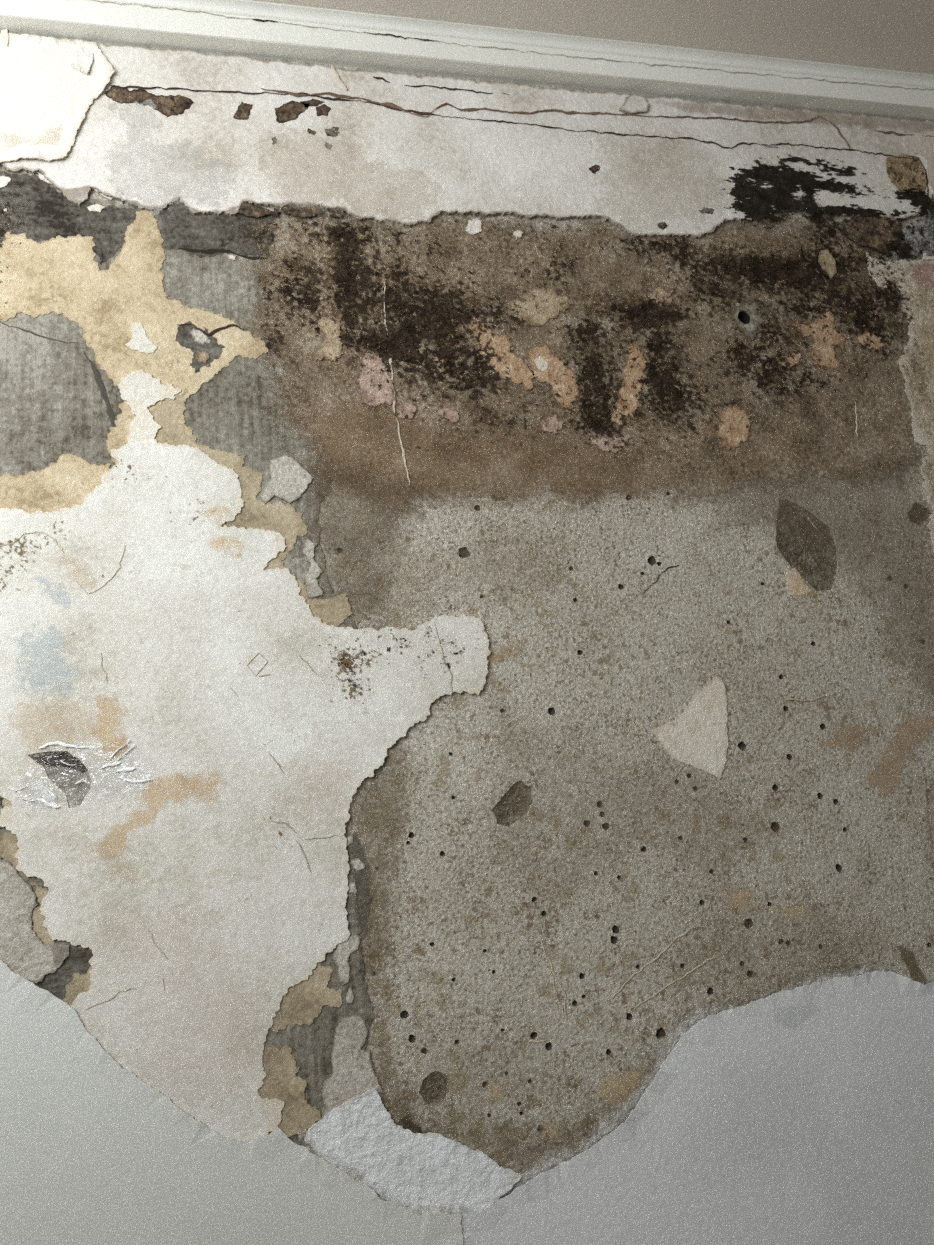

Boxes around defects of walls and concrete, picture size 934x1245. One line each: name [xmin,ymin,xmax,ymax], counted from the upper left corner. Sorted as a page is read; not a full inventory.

crack [94,0,934,90]
peeling [0,43,934,261]
crack [110,76,934,196]
leakage [0,191,21,282]
peeling [817,249,837,279]
peeling [466,286,579,434]
leakage [241,155,934,704]
peeling [590,344,647,453]
peeling [716,405,752,451]
peeling [778,308,886,371]
peeling [0,209,490,1141]
peeling [652,677,746,791]